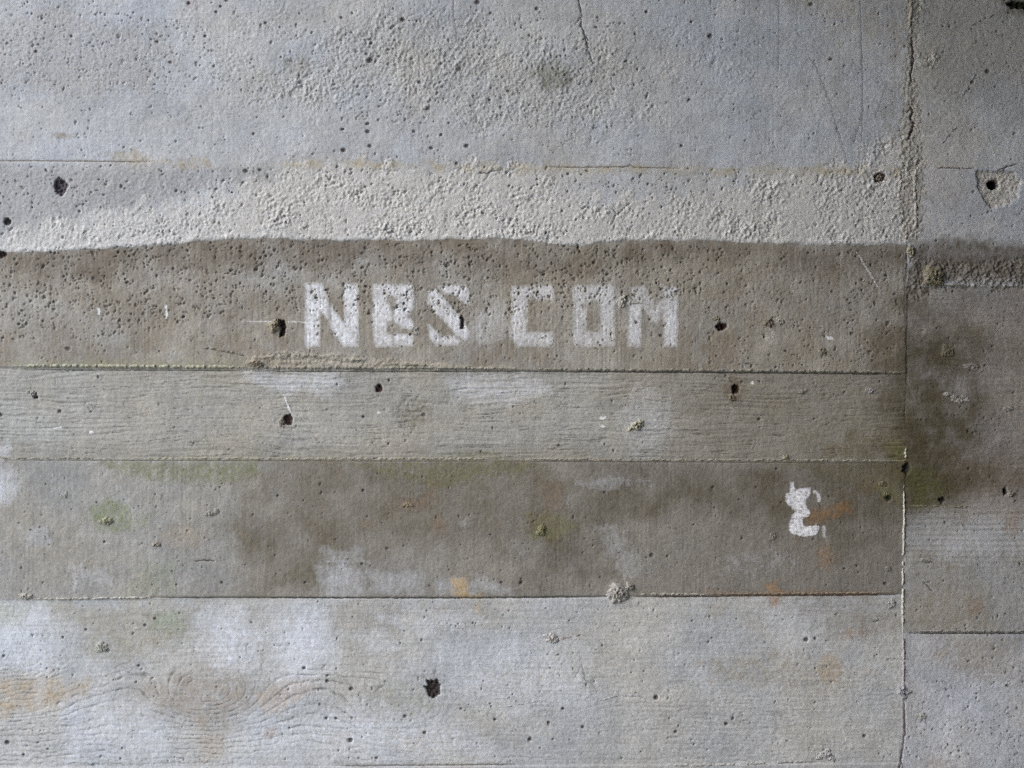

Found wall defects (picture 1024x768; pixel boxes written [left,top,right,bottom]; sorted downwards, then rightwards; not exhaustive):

crack [576,0,593,65]
crack [906,107,916,137]
water stain [0,232,1024,768]
corrosion [804,498,855,526]